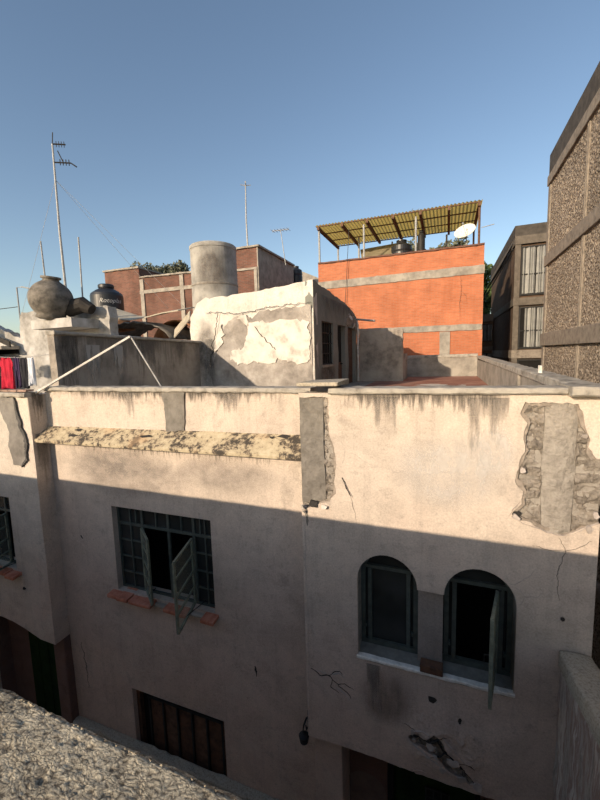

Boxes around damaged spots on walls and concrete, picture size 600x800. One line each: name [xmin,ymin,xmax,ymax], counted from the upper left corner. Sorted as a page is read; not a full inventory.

peeling [210,304,313,387]
damp [353,394,495,404]
flaking render [299,397,336,526]
flaking render [509,402,600,536]
crack [505,538,591,605]
crack [311,668,354,700]
flaking render [411,729,482,794]